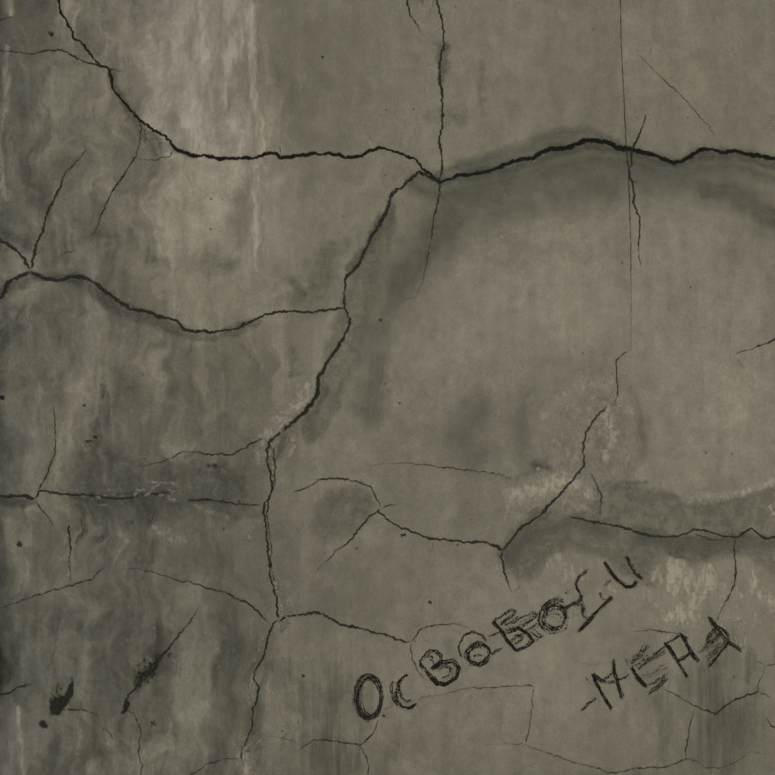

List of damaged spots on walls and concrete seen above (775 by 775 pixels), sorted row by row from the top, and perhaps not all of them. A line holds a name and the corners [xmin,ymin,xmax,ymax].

leakage [188,0,266,273]
crack [0,0,775,431]
leakage [302,129,775,441]
crack [14,521,100,604]
crack [0,412,175,522]
crack [174,579,266,620]
flaking render [253,381,320,489]
crack [240,432,417,758]
crack [295,352,775,618]
leakage [505,476,775,639]
crack [123,615,194,774]
crack [475,662,775,774]